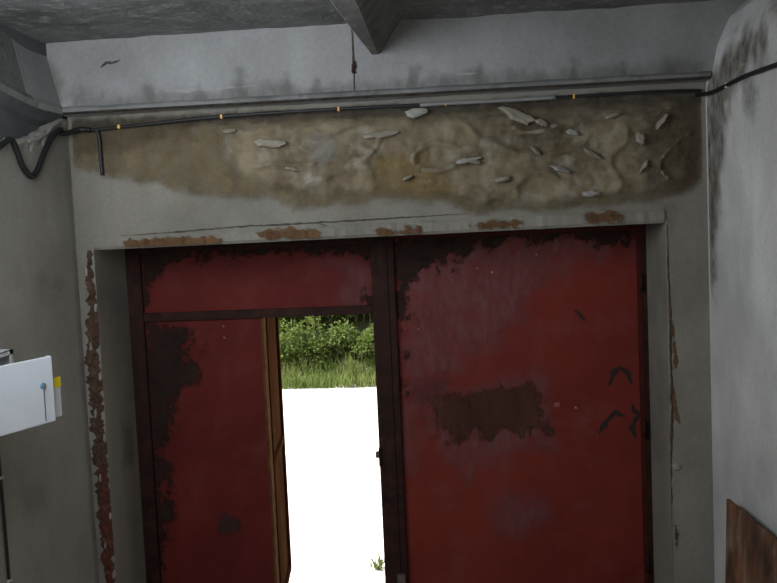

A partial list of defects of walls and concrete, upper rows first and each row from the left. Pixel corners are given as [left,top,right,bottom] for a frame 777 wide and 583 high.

leakage [73,35,766,249]
spalling [223,104,698,205]
spalling [84,250,116,583]
corrosion [123,226,373,306]
corrosion [375,210,634,479]